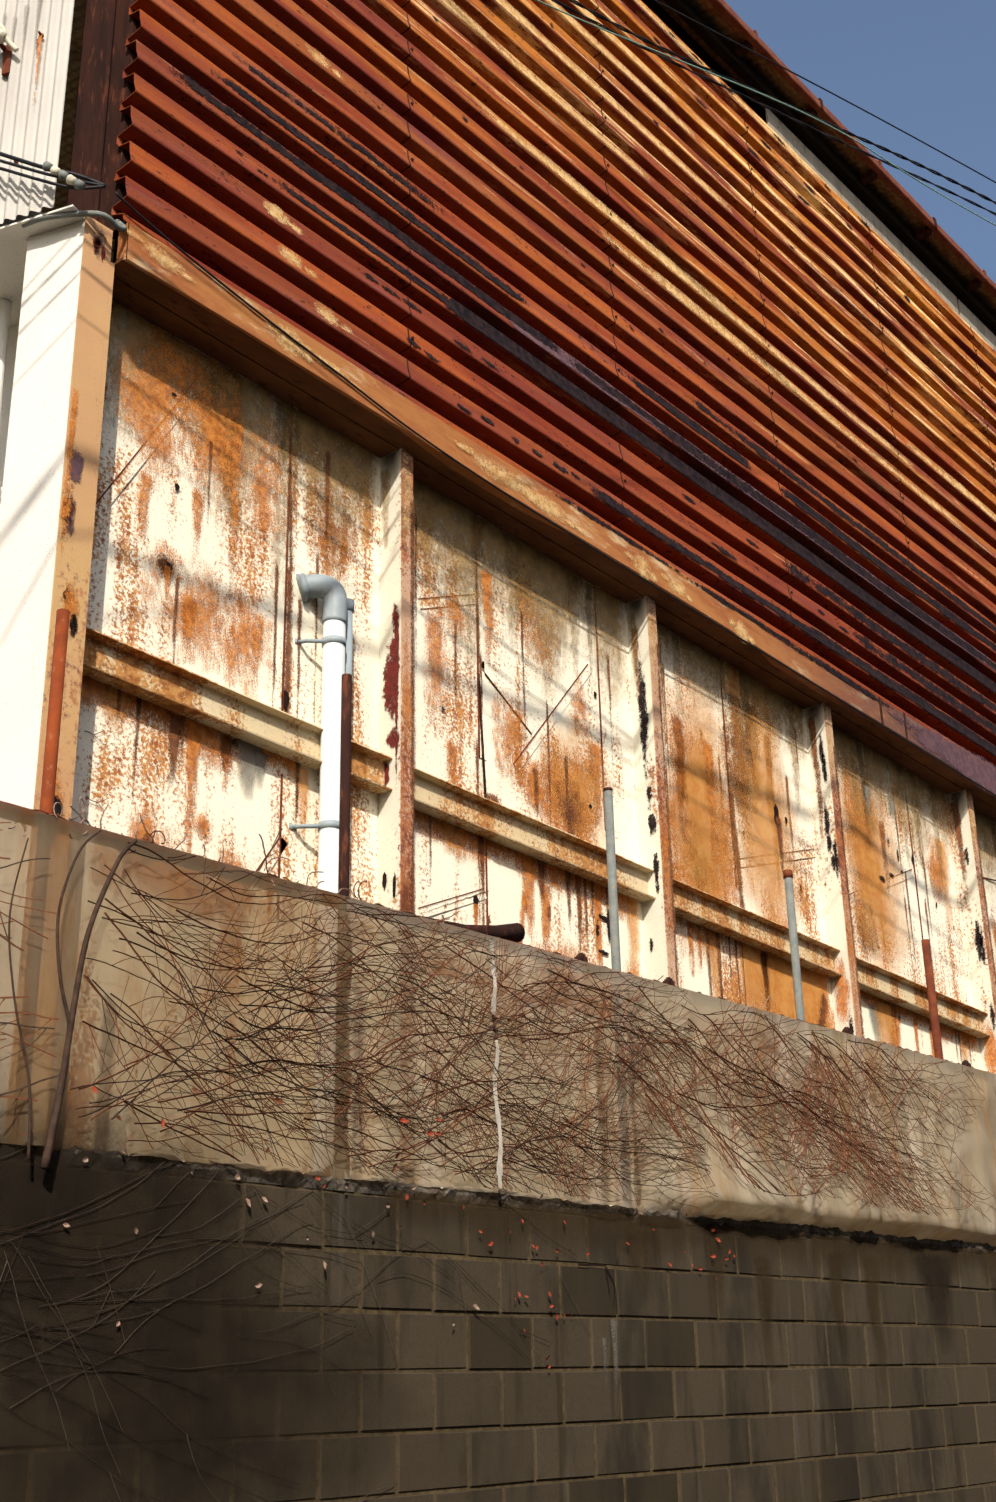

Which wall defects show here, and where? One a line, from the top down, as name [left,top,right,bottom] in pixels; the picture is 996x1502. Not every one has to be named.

rust [100,322,358,722]
rust [80,675,244,867]
rust [261,748,308,842]
rust [401,477,642,977]
rust [650,621,836,1030]
rust [827,719,977,1063]
rust [971,813,996,979]